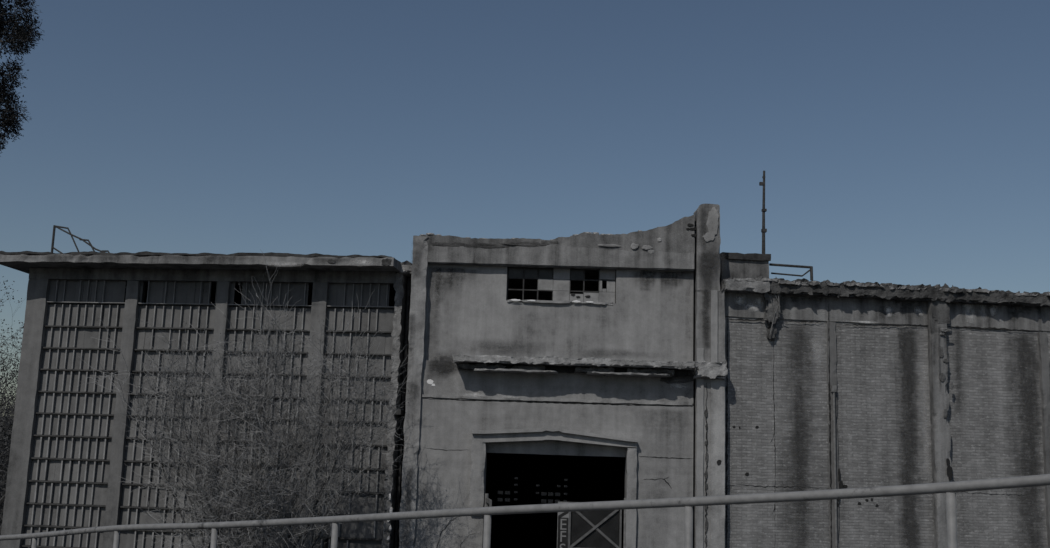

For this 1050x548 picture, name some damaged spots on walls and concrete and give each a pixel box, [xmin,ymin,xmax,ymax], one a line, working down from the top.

peeling [686,207,719,242]
leakage [900,332,917,548]